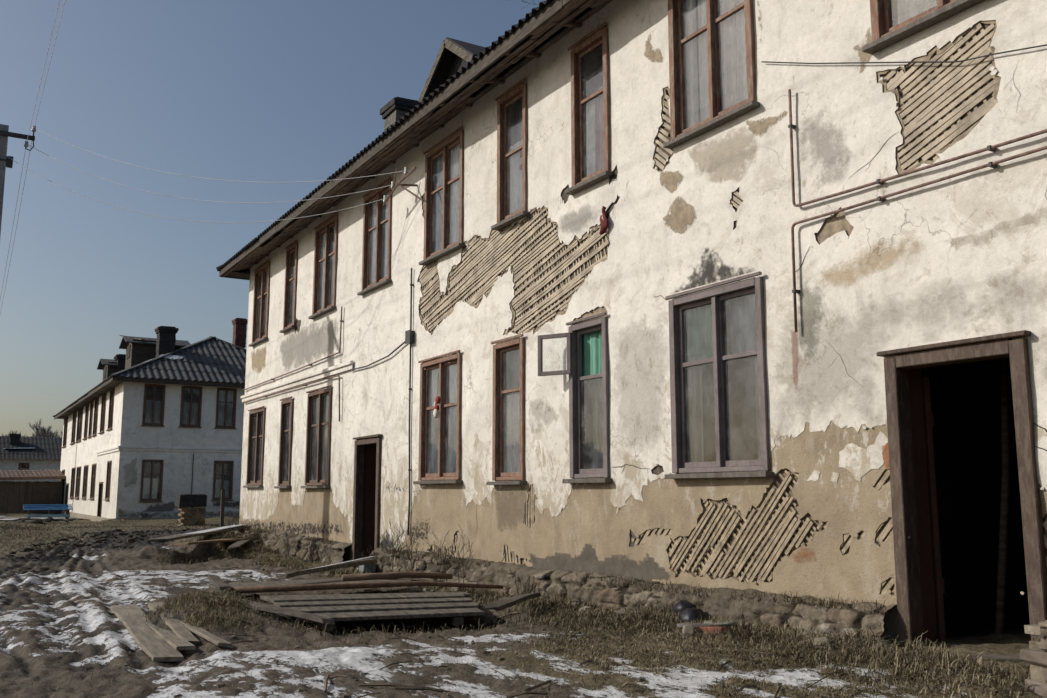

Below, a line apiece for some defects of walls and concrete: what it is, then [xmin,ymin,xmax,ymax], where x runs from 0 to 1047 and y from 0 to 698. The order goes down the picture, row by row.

flaking render [418,196,620,335]
peeling [644,35,663,62]
flaking render [653,87,695,234]
peeling [746,111,787,136]
flaking render [812,208,854,244]
flaking render [877,20,1001,176]
peeling [399,421,899,646]
peeling [1039,484,1047,567]